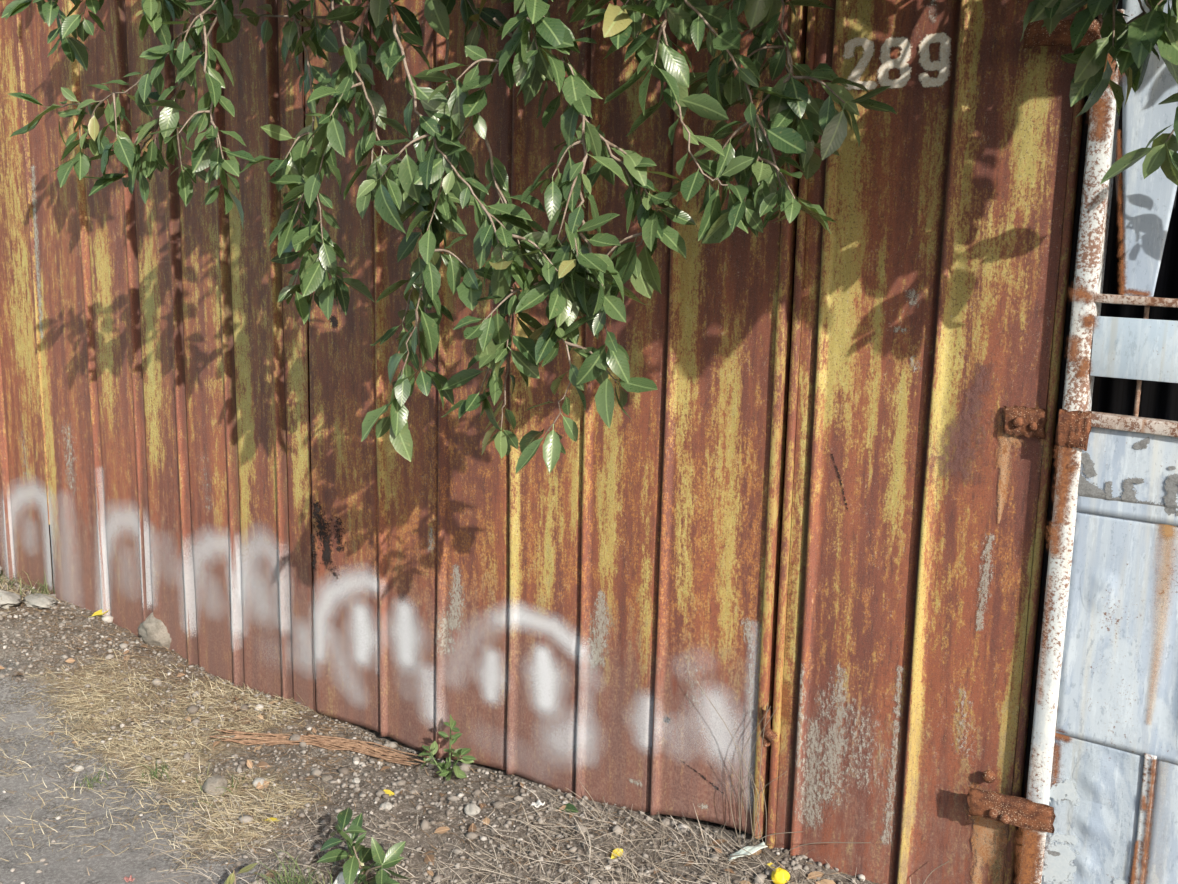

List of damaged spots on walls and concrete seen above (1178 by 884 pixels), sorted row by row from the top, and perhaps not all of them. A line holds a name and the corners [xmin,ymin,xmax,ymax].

rust [1068,284,1097,380]
rust [996,409,1024,524]
rust [1038,439,1080,556]
peeling [1077,452,1178,516]
peeling [1133,437,1150,450]
rust [781,680,793,725]
peeling [794,664,904,845]
rust [1051,730,1072,786]
rust [967,813,1046,884]